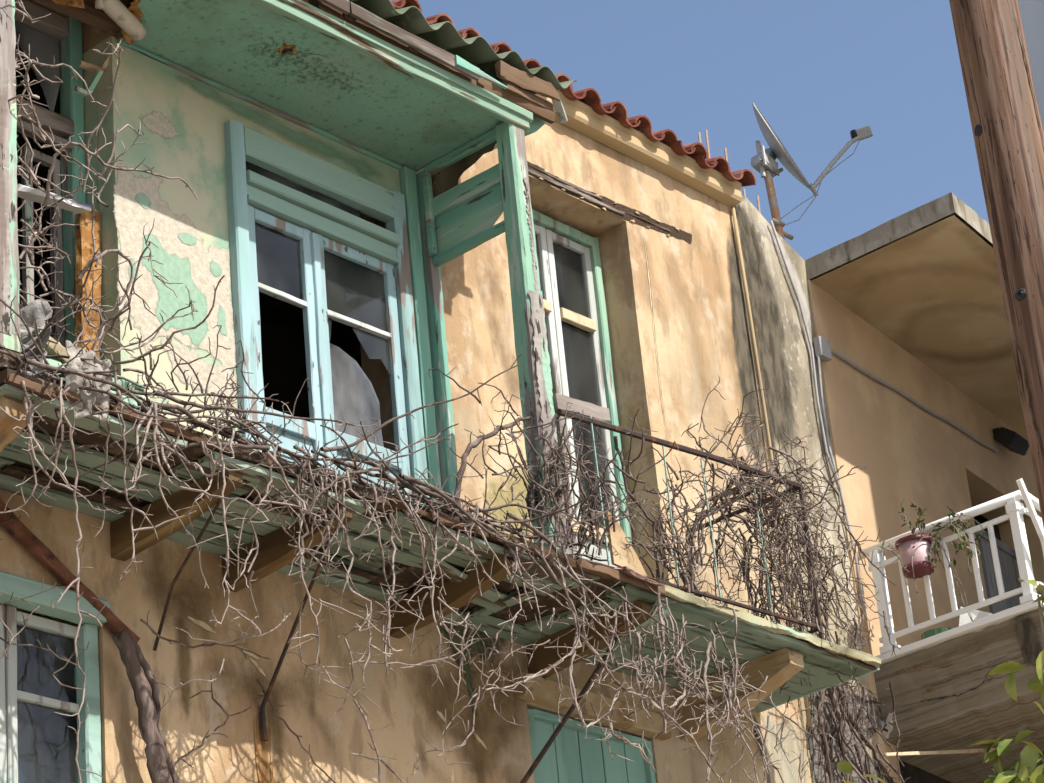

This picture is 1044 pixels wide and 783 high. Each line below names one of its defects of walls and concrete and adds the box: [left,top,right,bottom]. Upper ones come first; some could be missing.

flaking render [114,163,239,421]
leakage [728,205,792,465]